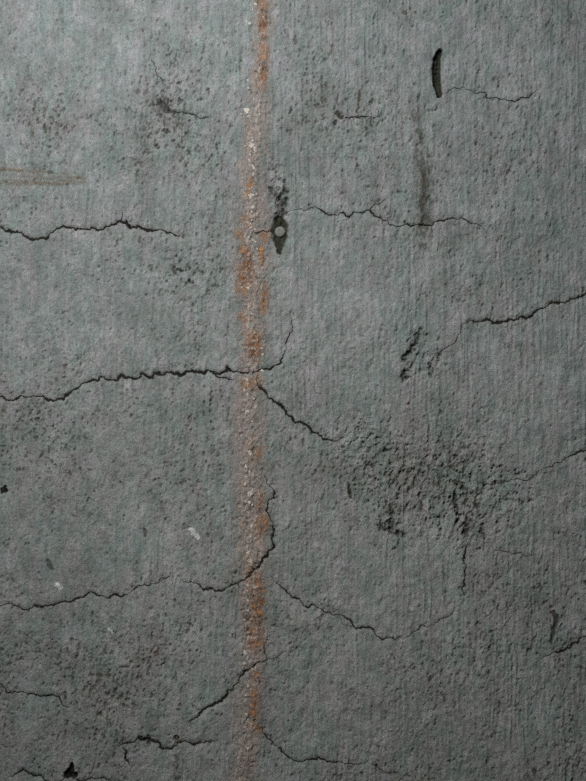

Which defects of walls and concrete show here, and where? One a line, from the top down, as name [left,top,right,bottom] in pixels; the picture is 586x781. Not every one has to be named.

spalling [432,49,442,98]
crack [0,212,184,241]
crack [254,199,483,233]
crack [435,292,586,358]
crack [0,307,339,442]
rust [235,245,268,781]
crack [0,467,472,640]
crack [190,632,279,721]
crack [14,737,217,781]